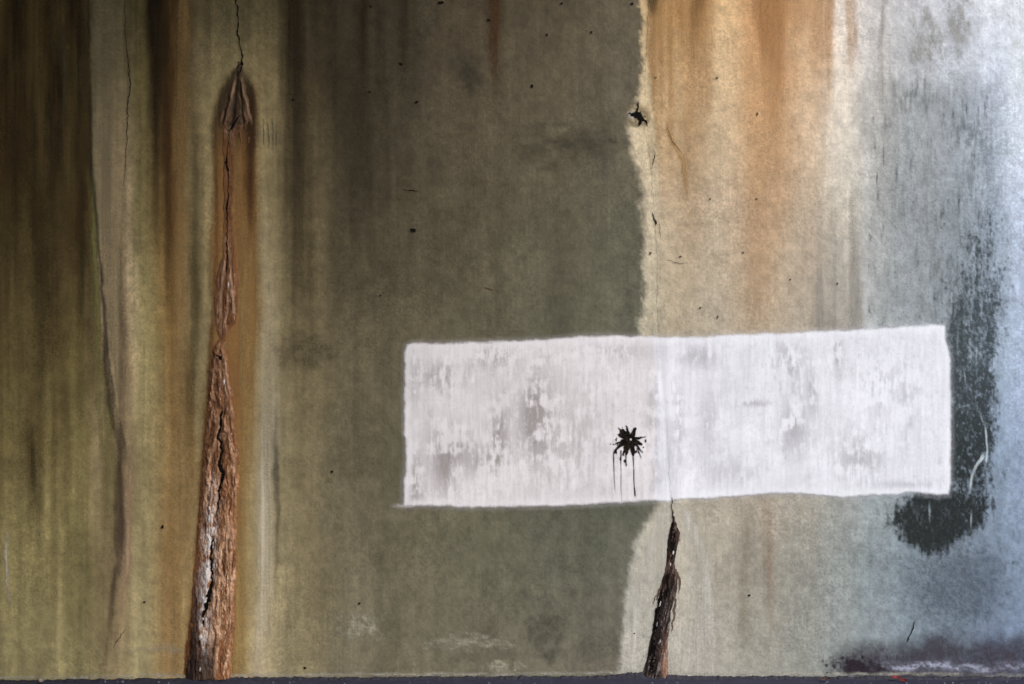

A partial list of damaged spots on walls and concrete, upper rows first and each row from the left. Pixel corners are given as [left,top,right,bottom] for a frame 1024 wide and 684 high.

crack [235,0,244,72]
rust [647,0,710,103]
rust [754,0,790,129]
rust [813,0,833,61]
leakage [0,0,130,435]
rust [193,71,258,676]
leakage [893,222,1005,625]
leakage [112,445,135,603]